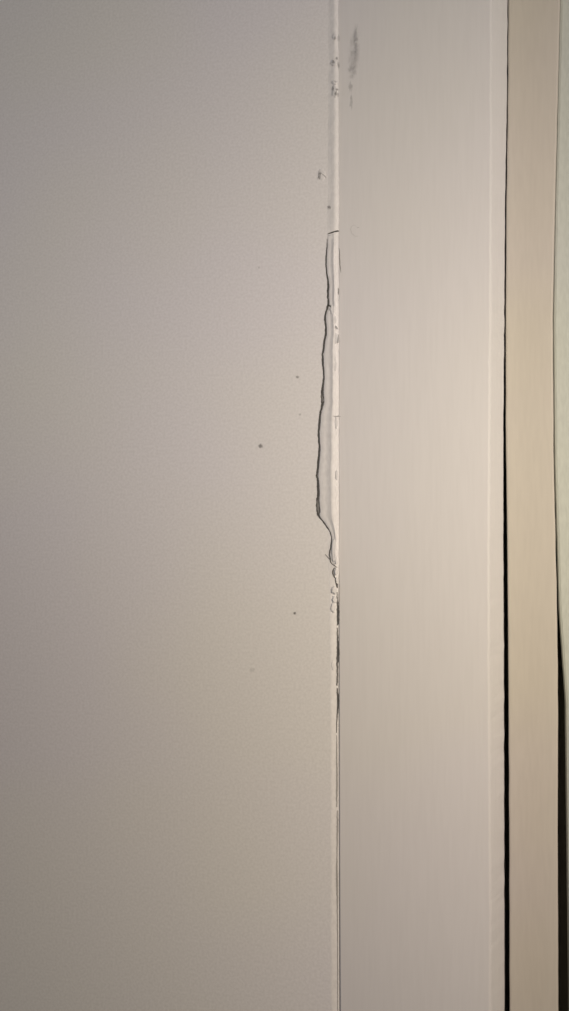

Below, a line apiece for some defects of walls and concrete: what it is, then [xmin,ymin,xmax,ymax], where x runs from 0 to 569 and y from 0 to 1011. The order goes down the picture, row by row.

crack [316,230,341,1008]